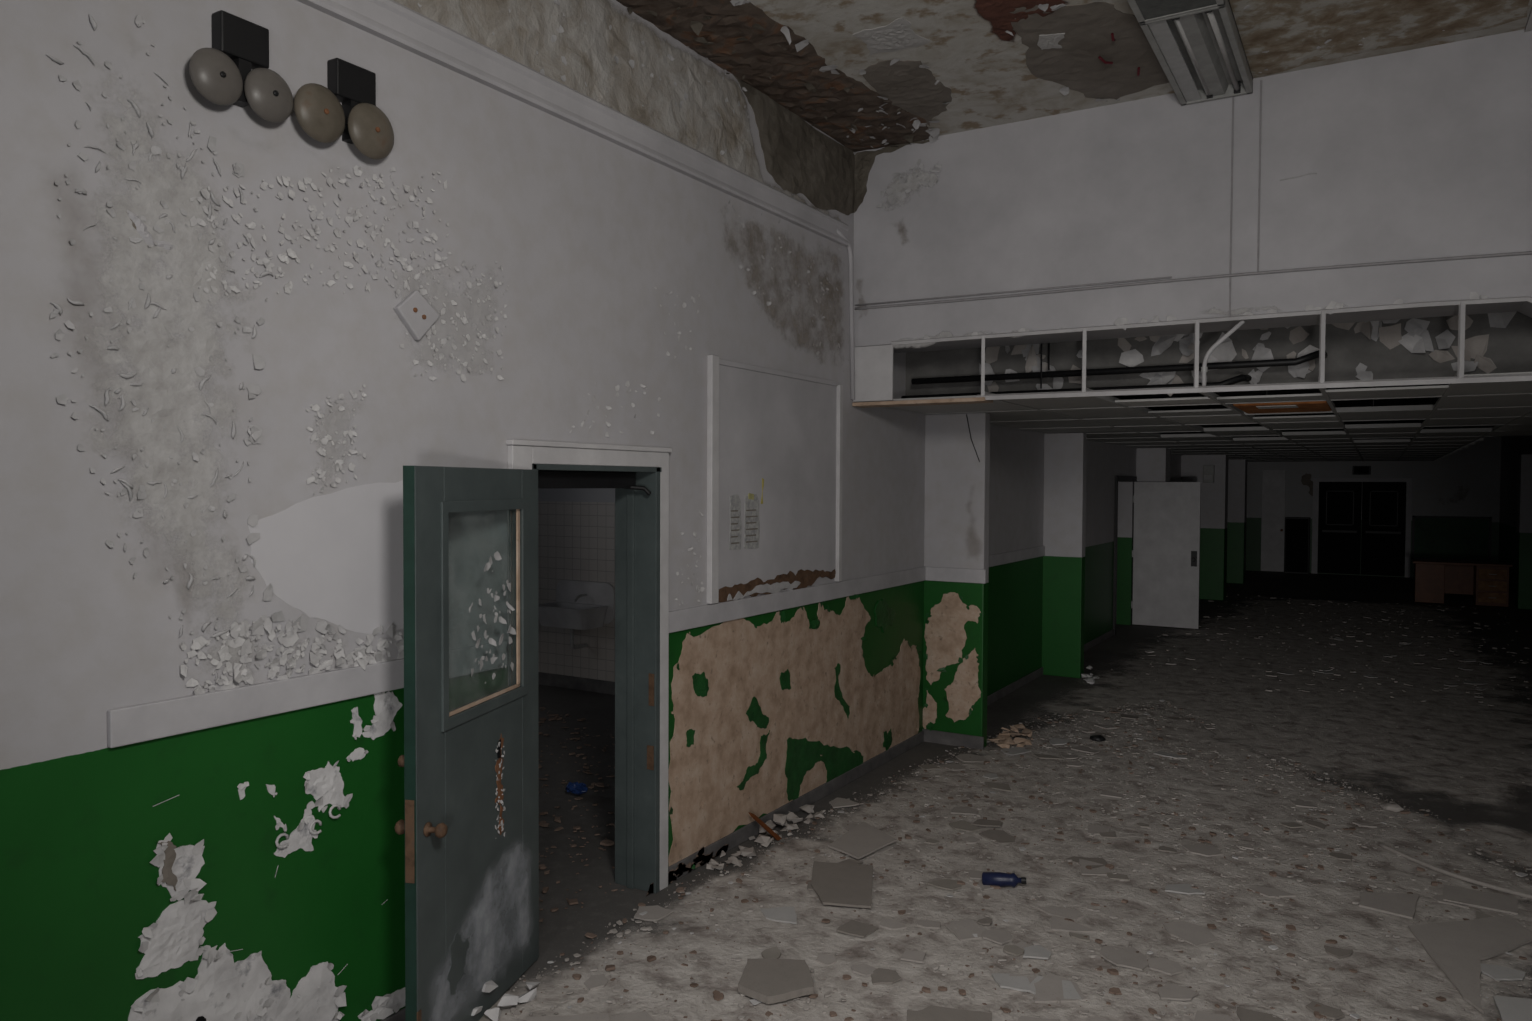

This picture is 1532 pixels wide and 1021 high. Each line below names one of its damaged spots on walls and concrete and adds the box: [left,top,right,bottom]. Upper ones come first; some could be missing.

flaking render [394,0,952,221]
flaking render [1005,2,1170,102]
peeling [1229,0,1530,78]
peeling [893,328,1087,392]
peeling [1114,292,1517,397]
peeling [469,551,516,684]
peeling [237,782,278,800]
peeling [274,691,402,858]
peeling [668,592,982,869]
peeling [128,833,405,1021]